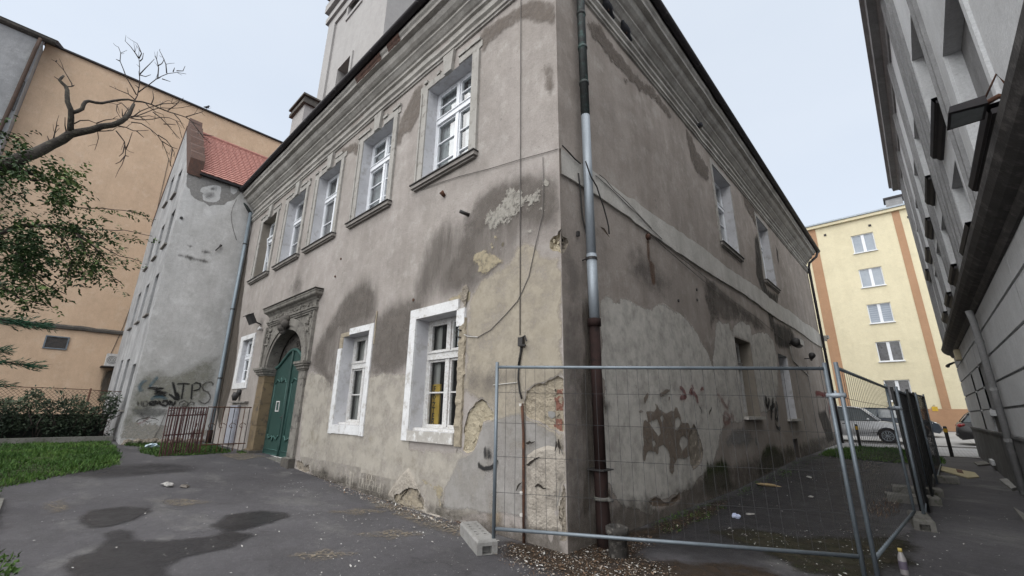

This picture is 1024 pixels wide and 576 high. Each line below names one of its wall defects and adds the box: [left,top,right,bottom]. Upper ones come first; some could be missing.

leakage [588,21,671,118]
peeling [186,173,242,206]
leakage [422,178,554,293]
peeling [473,177,549,274]
spalling [550,229,569,254]
leakage [315,284,419,384]
spalling [463,400,494,453]
spalling [523,376,564,432]
peeling [640,389,703,474]
spalling [395,480,443,510]